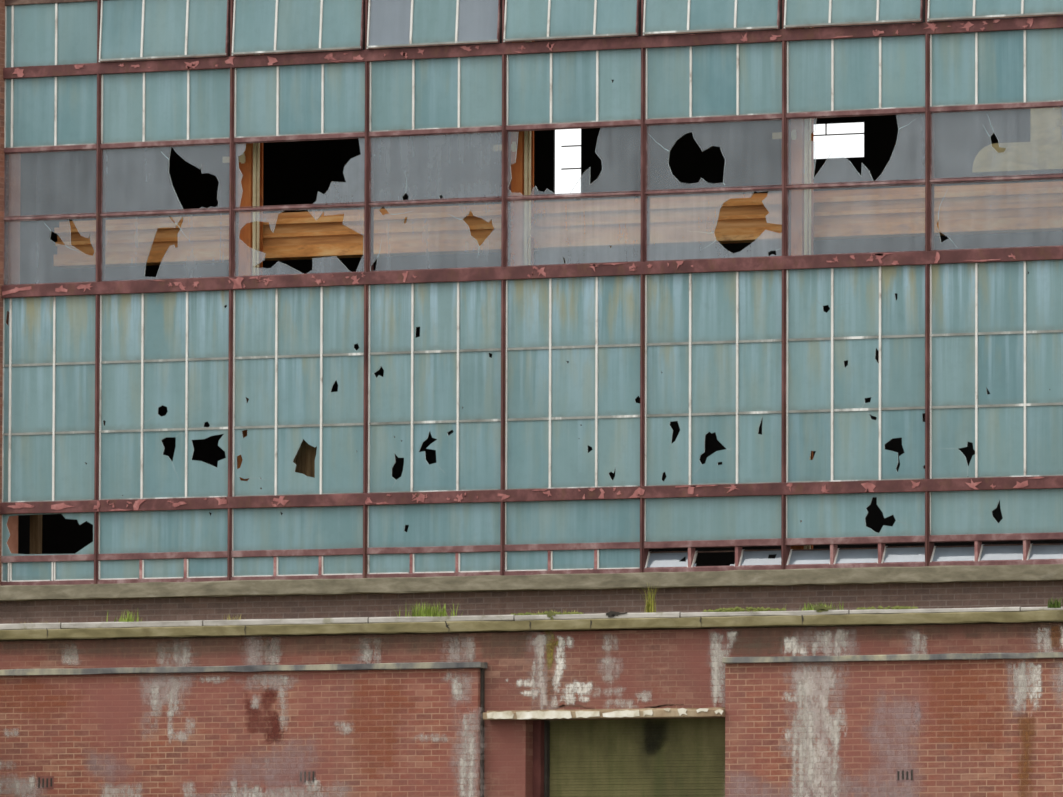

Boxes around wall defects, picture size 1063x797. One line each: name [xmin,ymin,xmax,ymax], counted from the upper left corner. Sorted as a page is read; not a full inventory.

peeling [912,19,1000,31]
peeling [324,53,364,62]
peeling [827,253,899,265]
peeling [2,286,32,296]
peeling [93,499,146,511]
peeling [578,487,645,499]
leakage [1038,627,1063,652]
leakage [493,635,592,708]
leakage [711,631,769,703]
leakage [142,638,193,740]
leakage [1008,663,1041,711]
leakage [784,629,854,797]